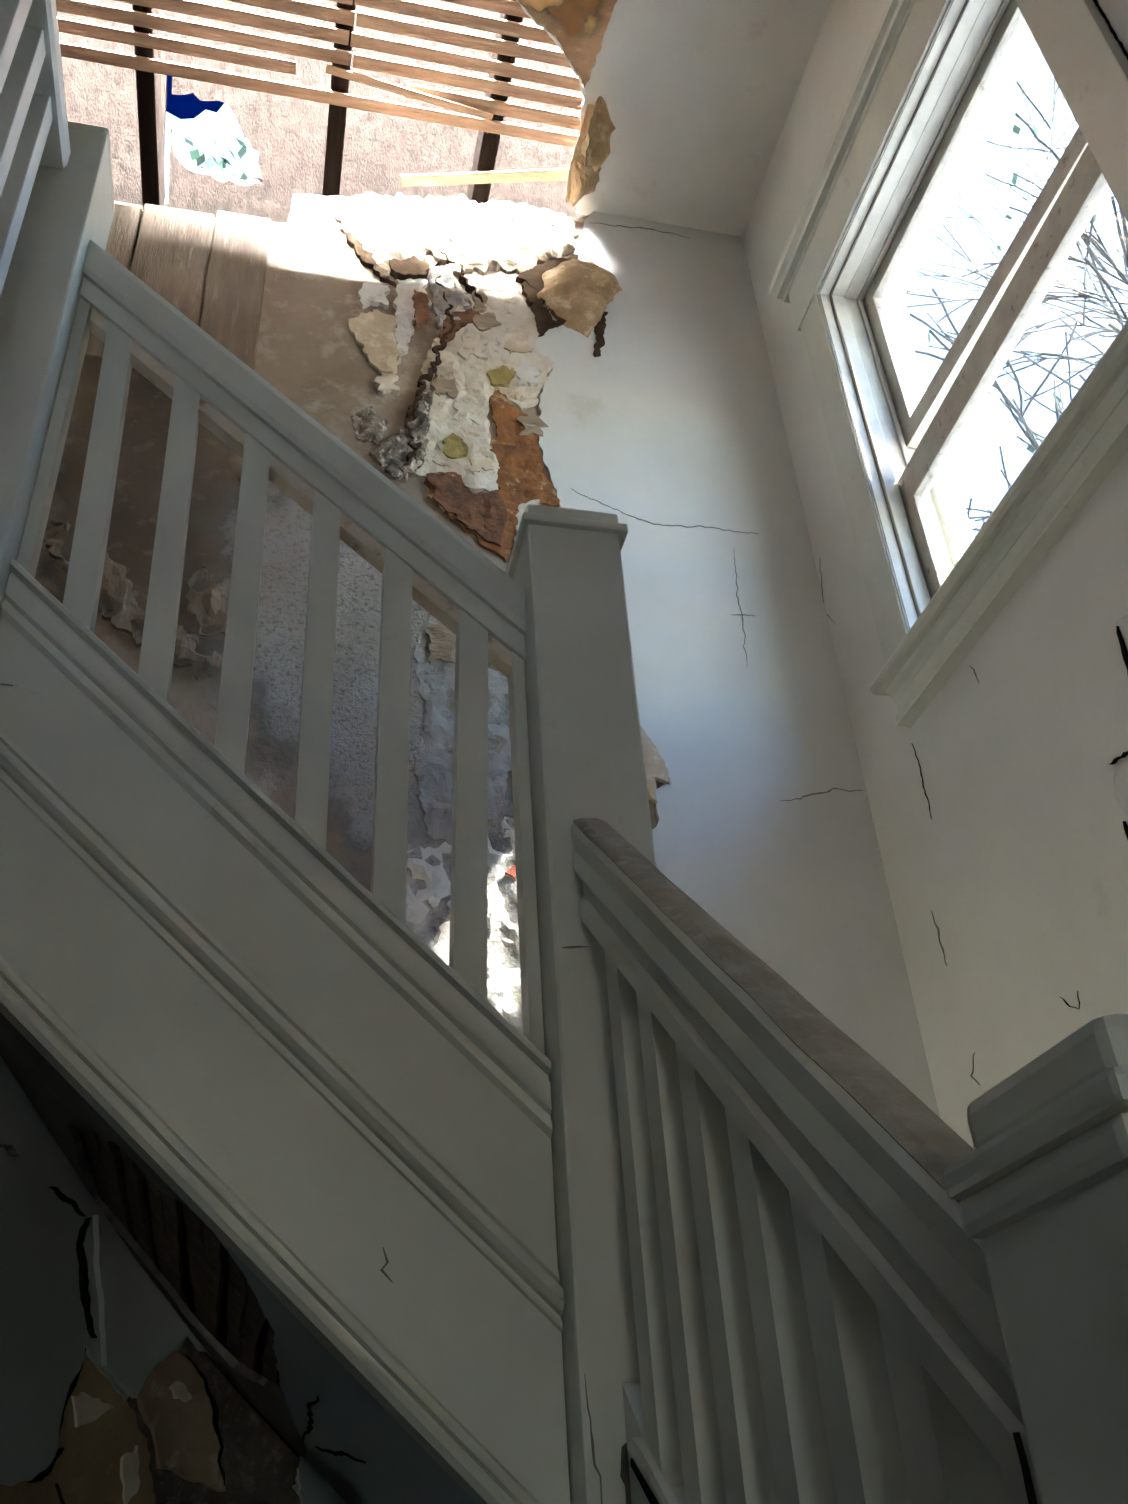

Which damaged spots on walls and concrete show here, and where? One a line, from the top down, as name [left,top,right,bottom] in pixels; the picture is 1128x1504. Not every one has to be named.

flaking render [334,0,618,492]
flaking render [514,499,540,543]
crack [572,489,758,659]
crack [779,788,863,802]
crack [1110,751,1128,765]
crack [48,1187,97,1338]
peeling [0,1215,226,1504]
crack [302,1396,366,1464]